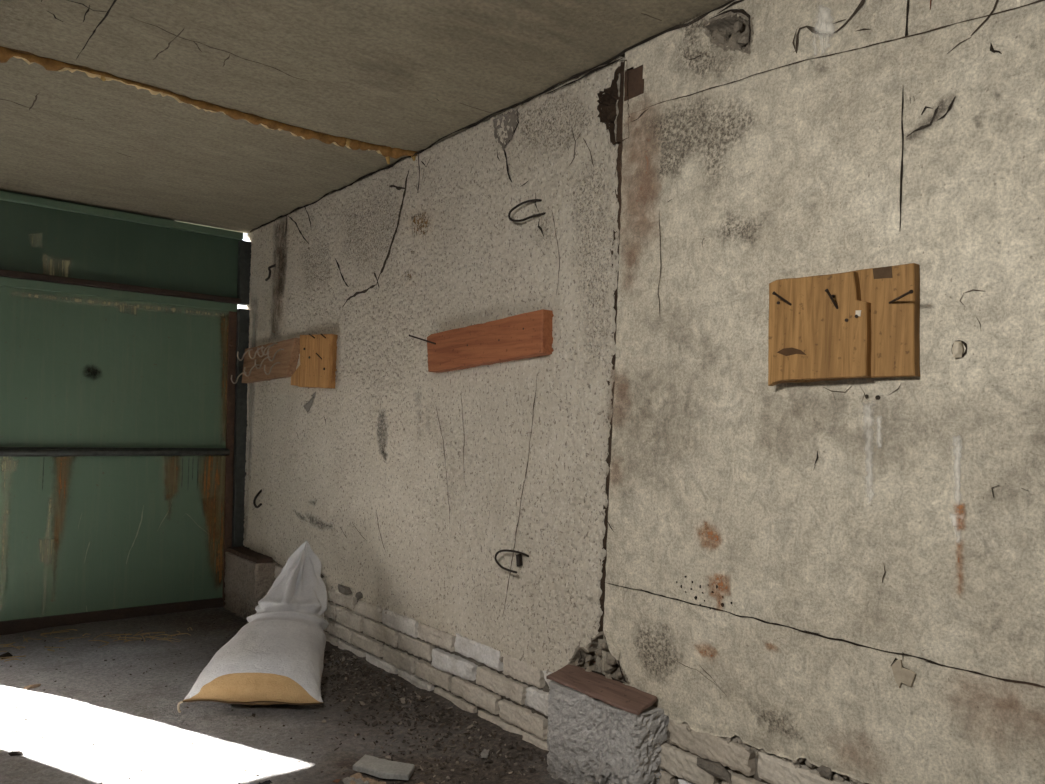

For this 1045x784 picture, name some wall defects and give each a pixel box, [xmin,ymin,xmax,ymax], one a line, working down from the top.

crack [41,0,304,80]
spalling [701,7,754,54]
spalling [597,60,644,145]
crack [250,0,1045,688]
damp [863,403,881,500]
damp [950,436,964,540]
spalling [568,630,630,684]
spalling [717,735,869,784]